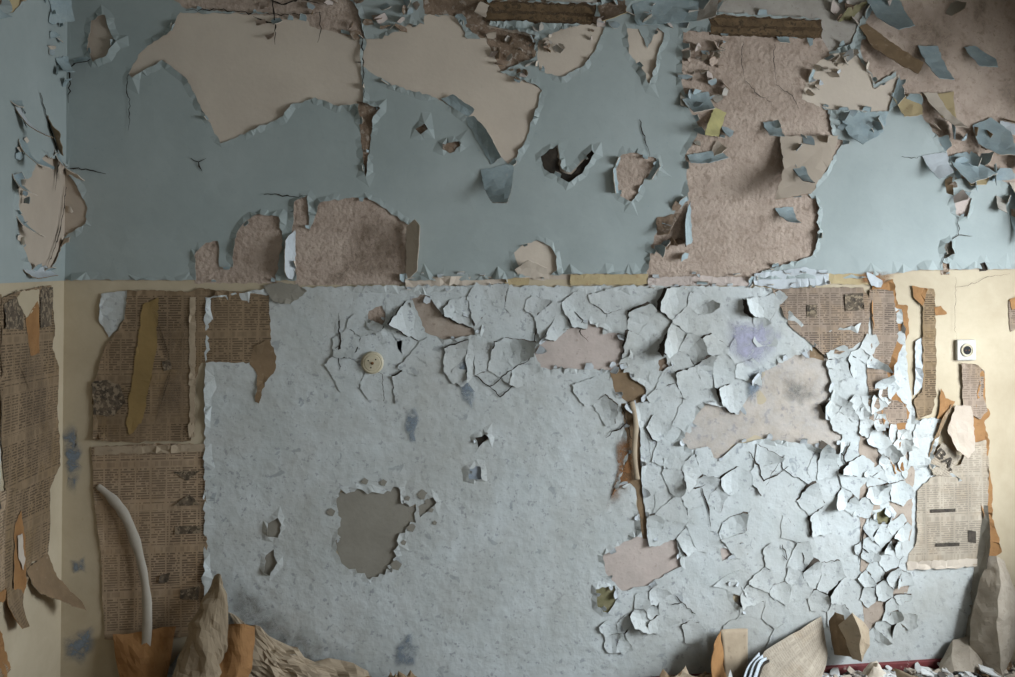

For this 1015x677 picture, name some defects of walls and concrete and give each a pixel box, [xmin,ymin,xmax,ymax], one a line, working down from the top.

peeling [45,0,116,87]
crack [190,0,322,43]
spalling [129,0,1015,289]
peeling [11,100,87,279]
peeling [99,291,127,337]
peeling [284,197,942,654]
crack [749,452,787,482]
crack [693,485,711,527]
peeling [264,518,281,575]
crack [859,531,868,565]